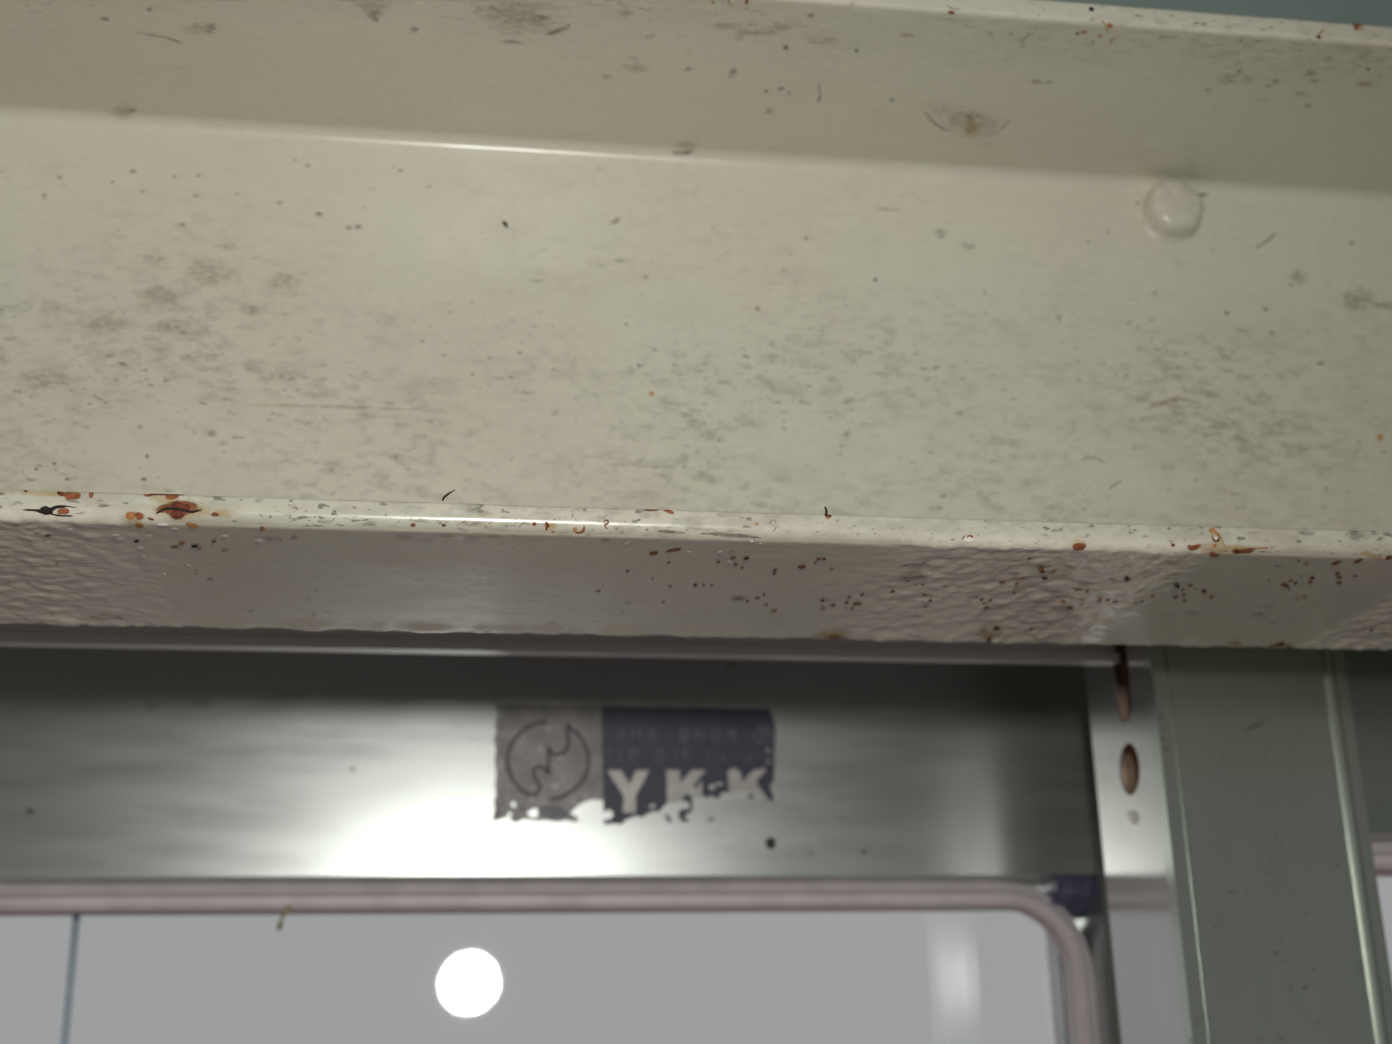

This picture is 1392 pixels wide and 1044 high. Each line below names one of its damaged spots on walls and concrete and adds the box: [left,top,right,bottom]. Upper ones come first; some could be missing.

rust [126,494,224,528]
rust [1171,528,1268,557]